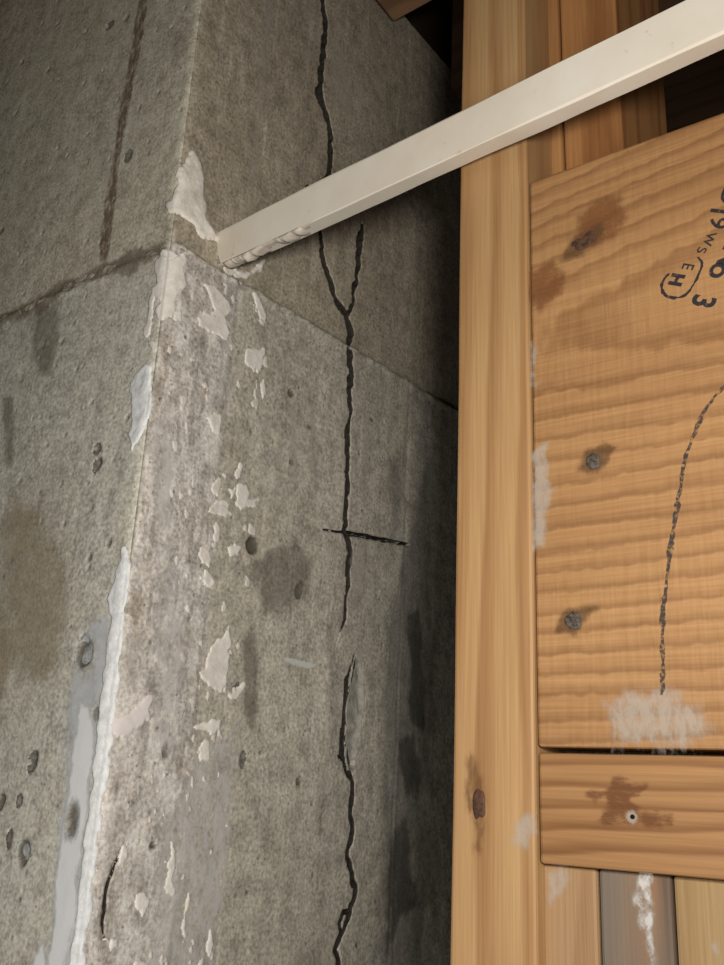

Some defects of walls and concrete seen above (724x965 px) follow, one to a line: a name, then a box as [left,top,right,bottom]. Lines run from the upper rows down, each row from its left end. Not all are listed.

crack [305,0,334,187]
flaking render [143,249,268,410]
water stain [128,364,171,524]
flaking render [206,412,222,435]
flaking render [185,462,261,588]
crack [318,224,408,965]
water stain [33,545,131,965]
crack [100,852,120,939]